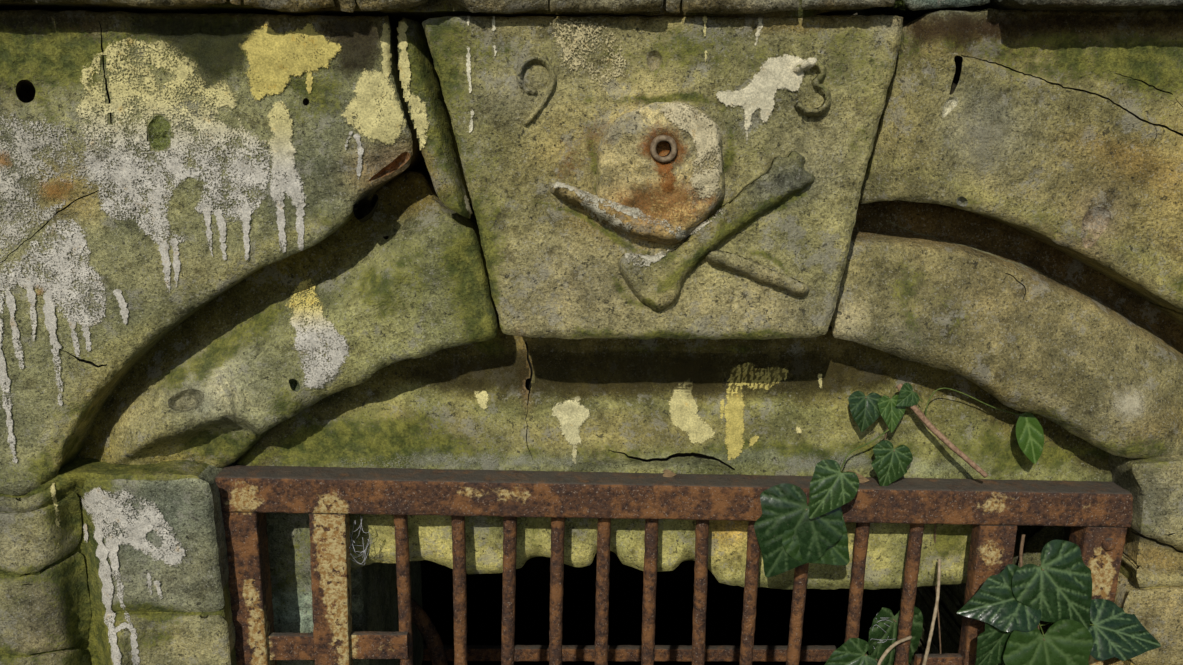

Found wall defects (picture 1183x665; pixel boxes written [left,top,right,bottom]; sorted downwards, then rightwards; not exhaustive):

crack [961,55,1183,143]
corrosion [619,133,712,219]
leakage [0,13,430,463]
crack [525,342,533,460]
crack [609,450,735,470]
leakage [81,488,187,665]